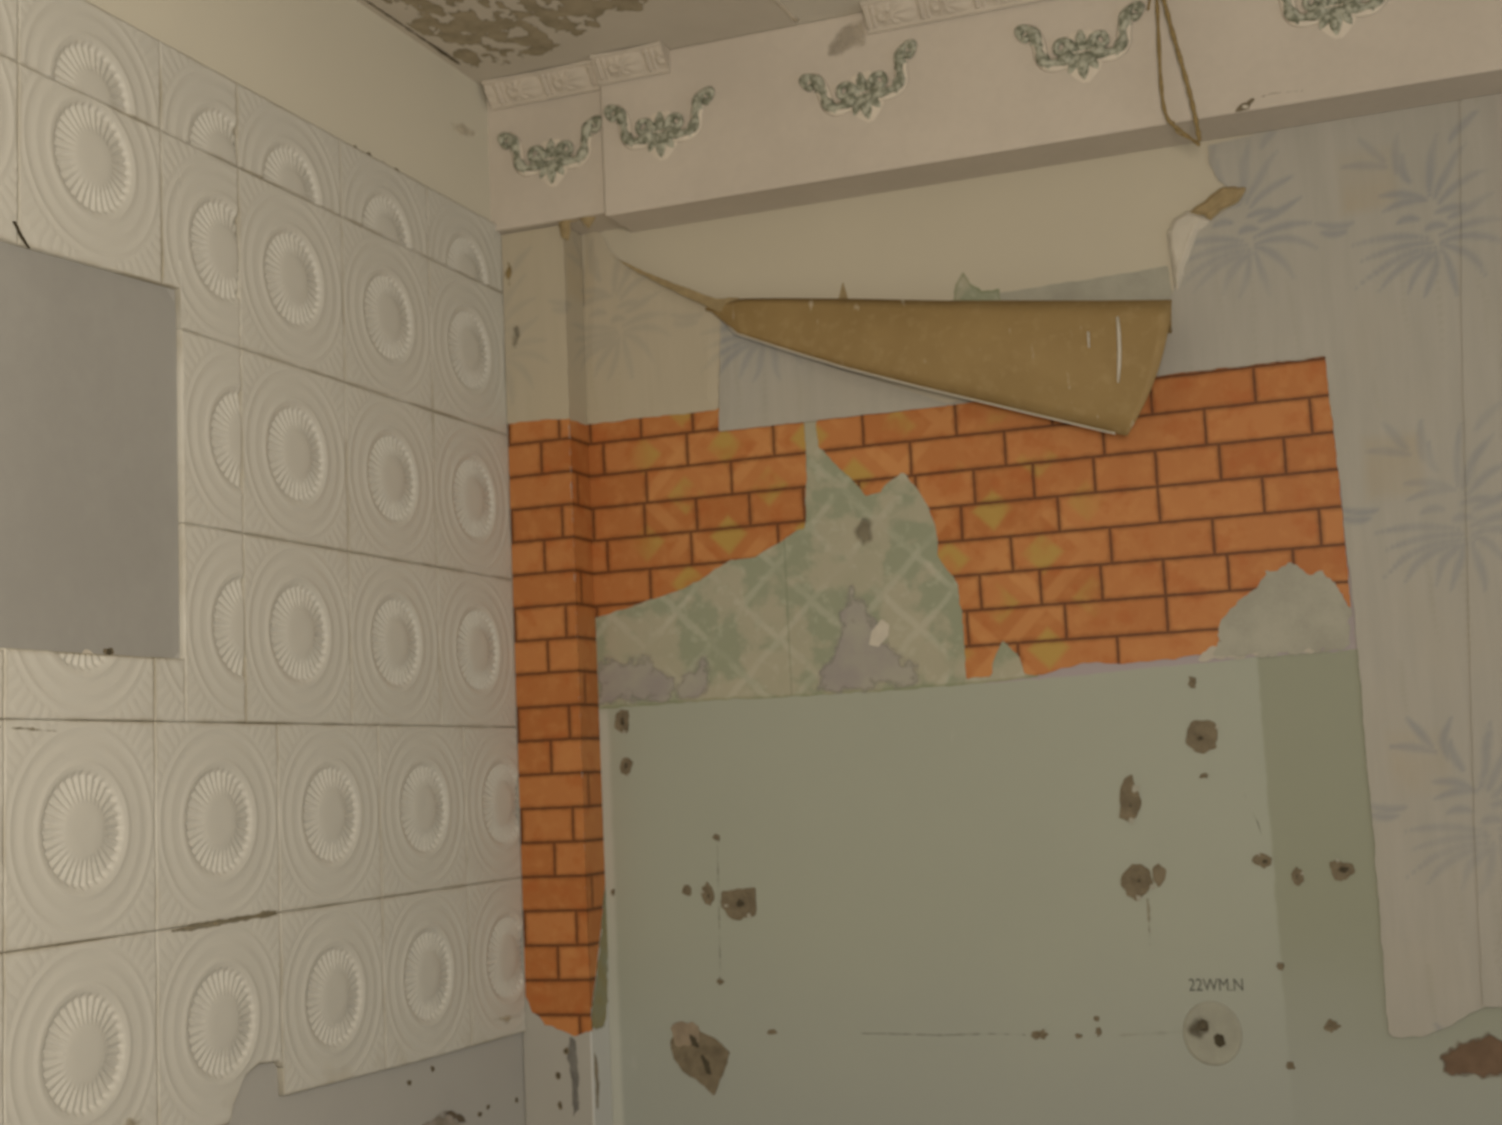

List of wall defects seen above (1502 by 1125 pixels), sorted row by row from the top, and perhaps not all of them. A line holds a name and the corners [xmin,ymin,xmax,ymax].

peeling [384,0,648,67]
flaking render [1000,266,1172,300]
flaking render [1186,720,1219,754]
flaking render [1119,775,1142,824]
flaking render [682,882,757,921]
flaking render [1121,863,1166,901]
flaking render [670,1021,730,1096]
peeling [424,1104,490,1125]